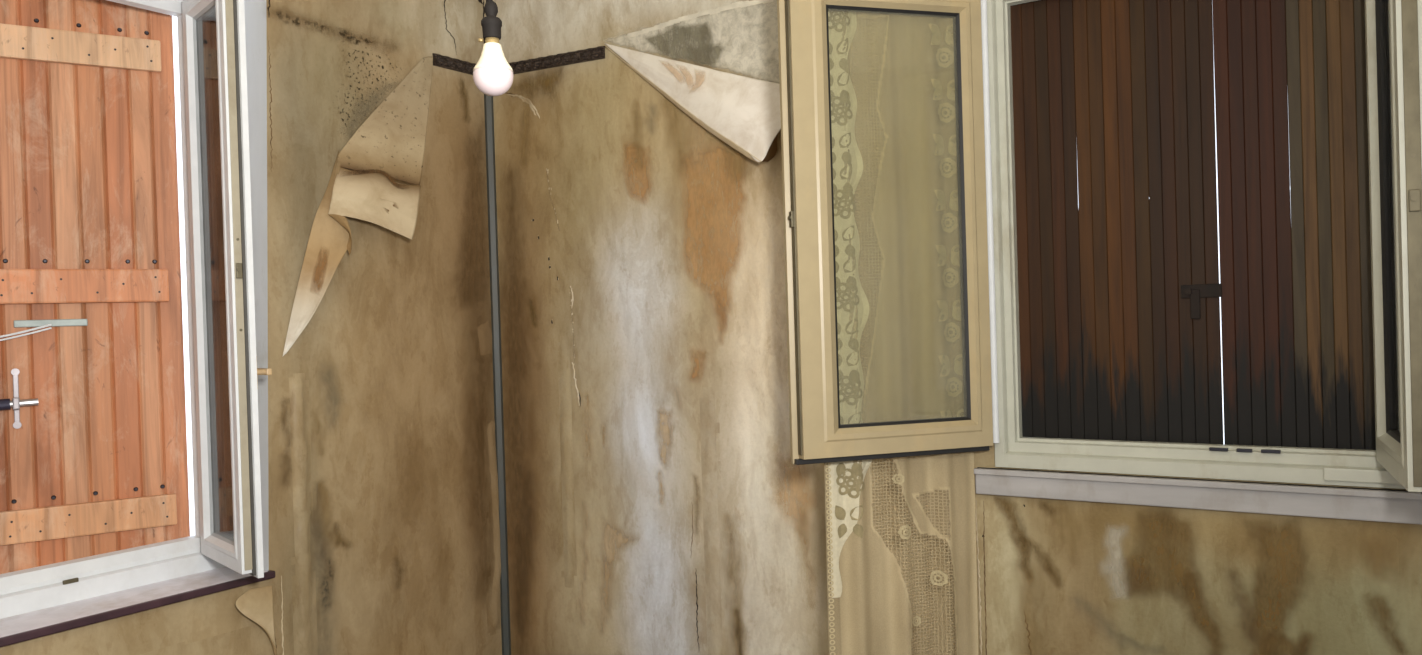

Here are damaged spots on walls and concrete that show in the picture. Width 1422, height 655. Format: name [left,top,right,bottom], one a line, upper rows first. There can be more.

leakage [277,12,401,127]
flaking render [607,0,779,83]
leakage [685,121,743,321]
leakage [999,499,1031,577]
leakage [1128,514,1219,654]
leakage [1251,524,1306,655]